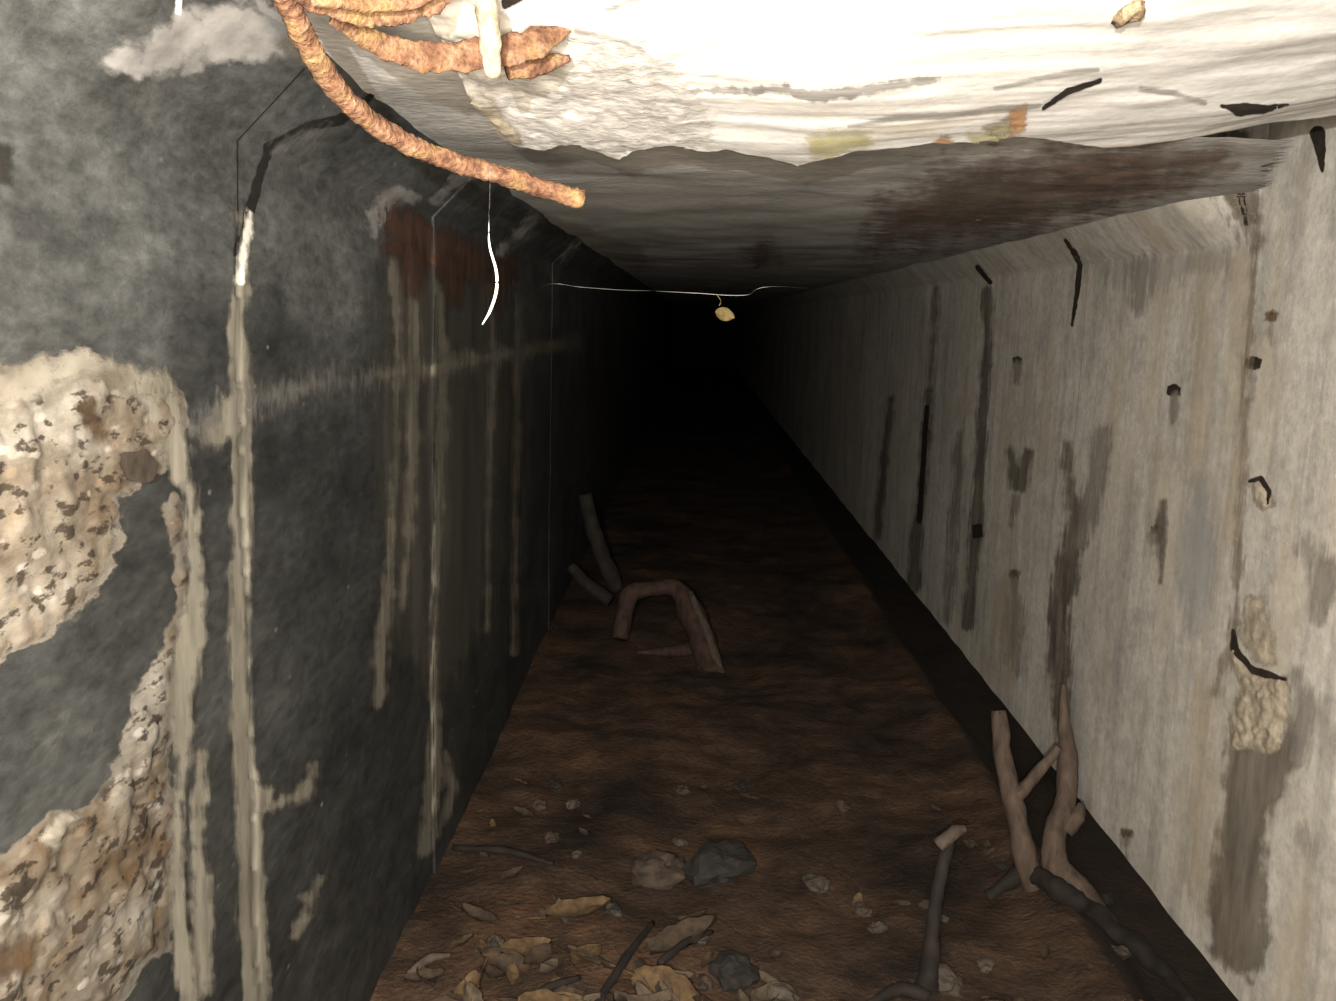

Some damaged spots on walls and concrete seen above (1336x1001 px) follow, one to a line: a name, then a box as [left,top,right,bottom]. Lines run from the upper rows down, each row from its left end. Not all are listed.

crack [234,93,374,256]
spalling [0,348,214,1001]
leakage [203,208,318,1001]
leakage [291,875,323,939]
leakage [373,258,581,858]
leakage [907,287,938,593]
leakage [945,265,993,630]
leakage [1008,448,1034,518]
leakage [1047,427,1112,732]
leakage [1156,500,1167,583]
leakage [1207,669,1328,973]
leakage [1296,544,1336,625]